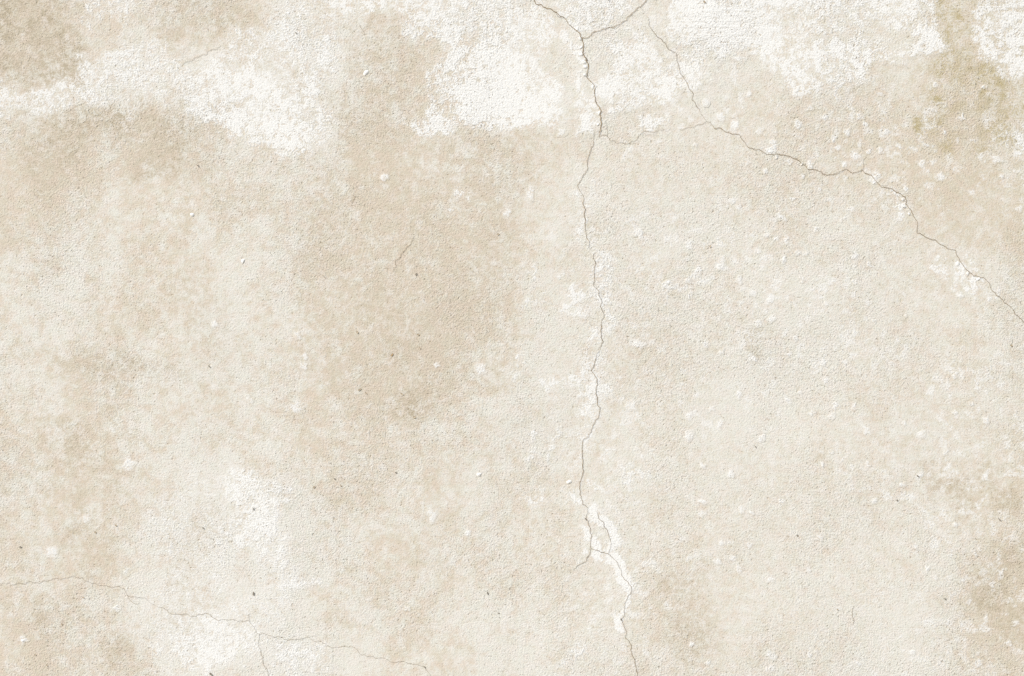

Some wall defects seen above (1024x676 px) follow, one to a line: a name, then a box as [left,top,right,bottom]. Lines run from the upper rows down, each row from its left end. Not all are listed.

crack [535,1,1024,671]